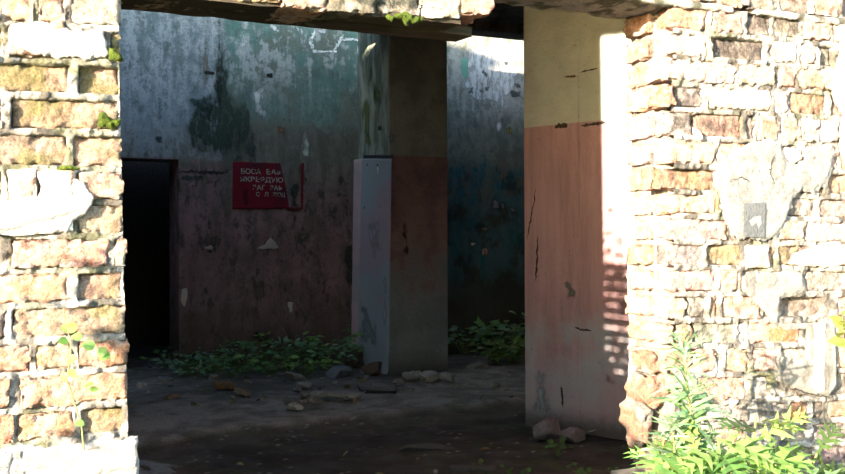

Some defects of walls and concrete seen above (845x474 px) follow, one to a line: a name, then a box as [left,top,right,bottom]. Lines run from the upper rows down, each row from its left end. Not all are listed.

leakage [188,43,250,153]
peeling [254,88,266,117]
flaking render [7,168,75,198]
flaking render [0,223,73,236]
crack [527,190,538,280]